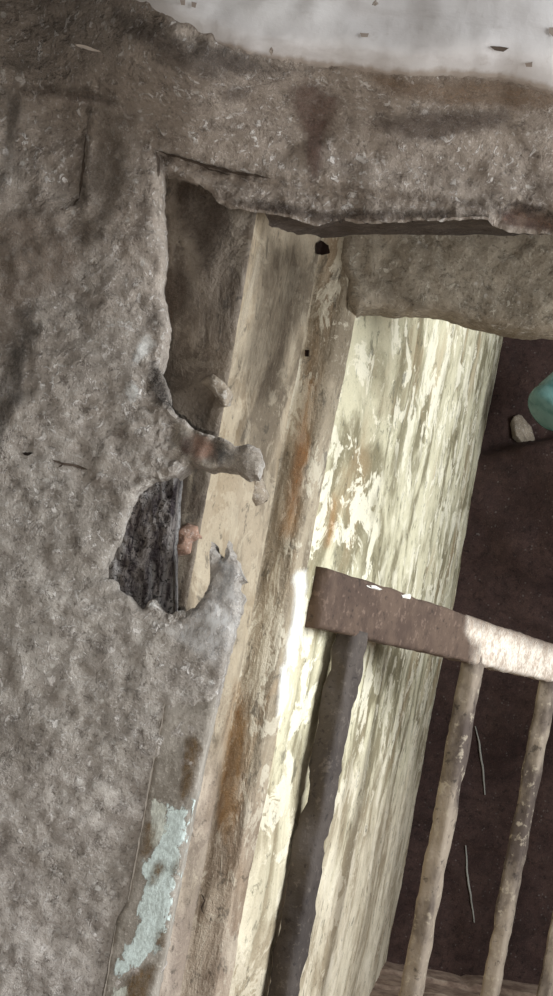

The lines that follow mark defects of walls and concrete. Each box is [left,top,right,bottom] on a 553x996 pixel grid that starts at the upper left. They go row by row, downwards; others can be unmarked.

crack [72,136,86,206]